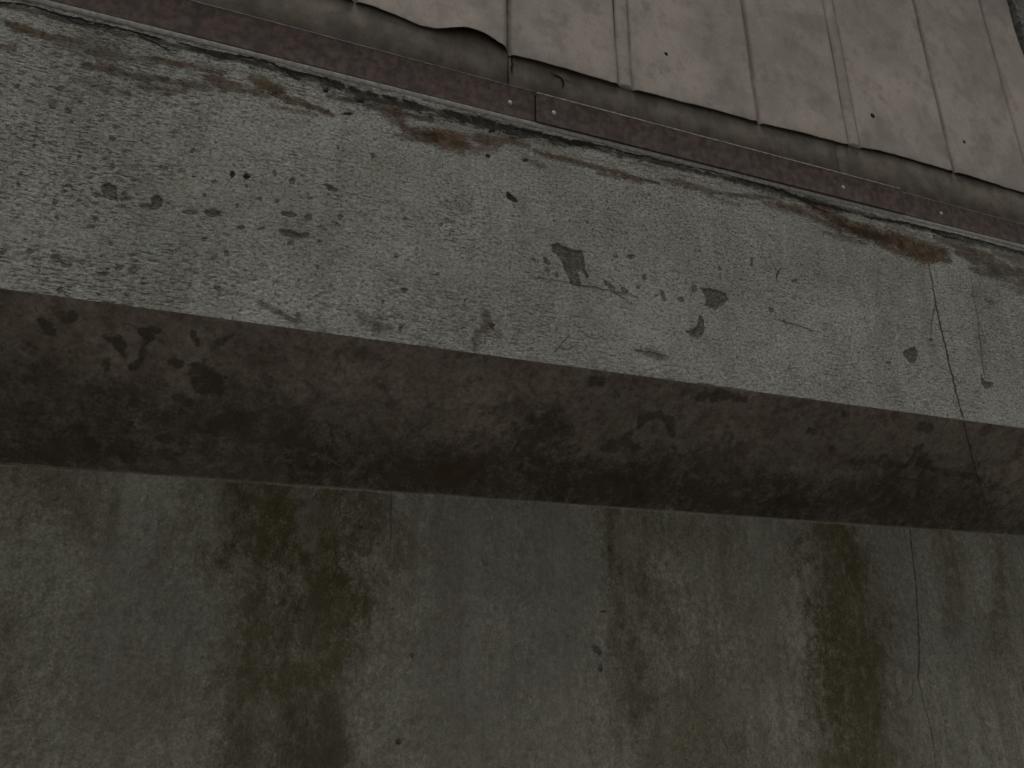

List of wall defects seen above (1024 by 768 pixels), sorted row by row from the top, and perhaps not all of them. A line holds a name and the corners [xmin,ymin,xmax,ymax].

rust [4,20,45,38]
rust [82,55,335,118]
rust [381,106,660,184]
spalling [532,243,589,286]
rust [803,200,1024,281]
spalling [655,285,728,337]
crack [516,127,1022,527]
spalling [903,346,918,364]
crack [910,531,935,752]